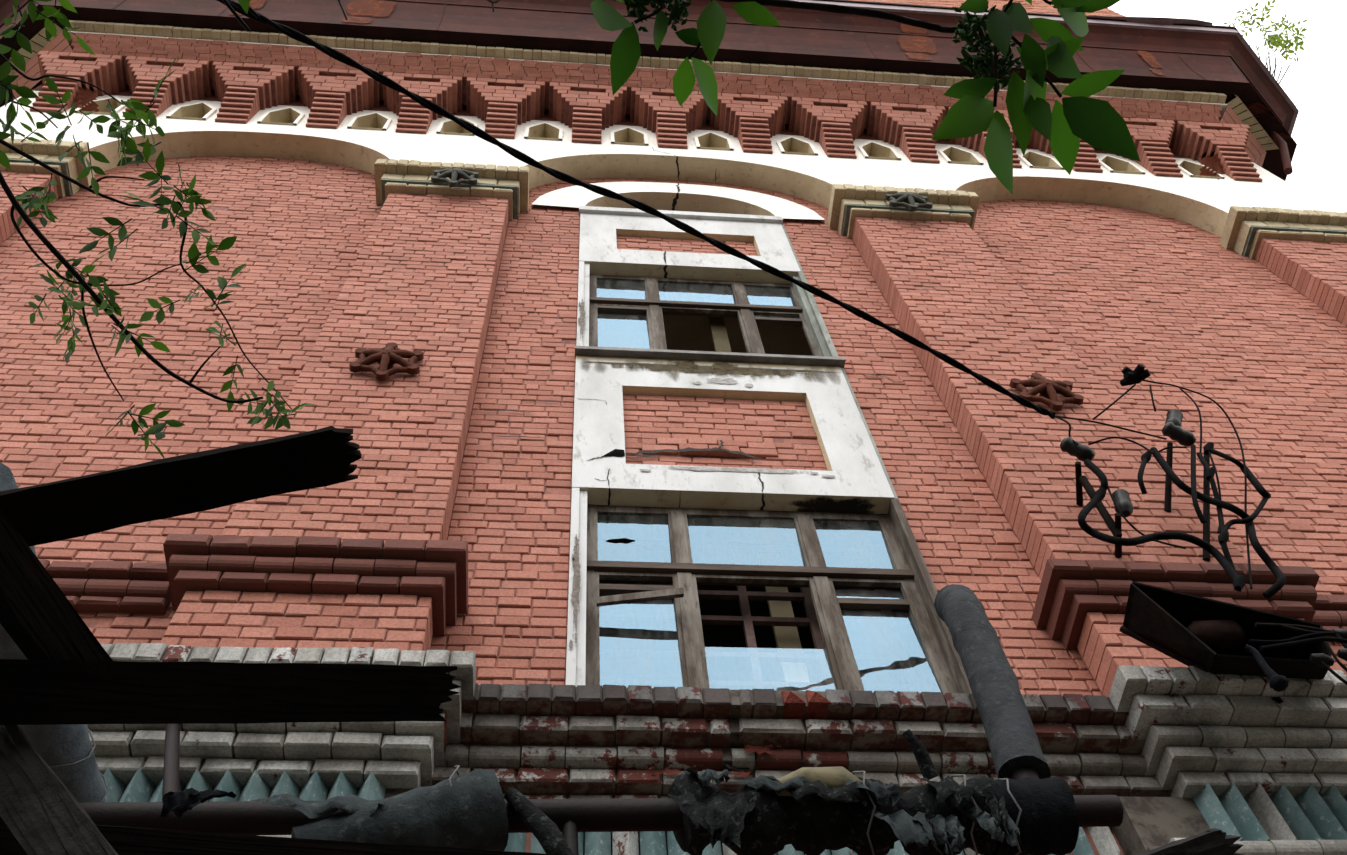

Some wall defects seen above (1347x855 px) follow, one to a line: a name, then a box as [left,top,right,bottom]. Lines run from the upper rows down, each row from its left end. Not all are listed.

crack [652,147,680,211]
crack [597,440,765,510]
spalling [781,690,831,720]